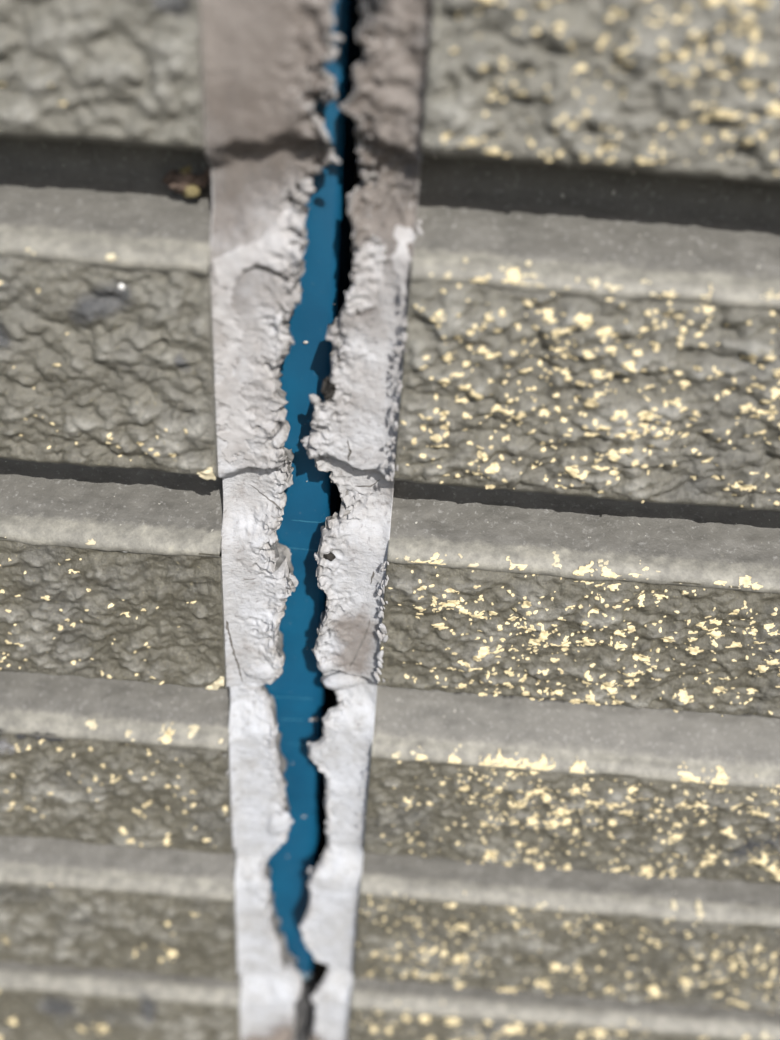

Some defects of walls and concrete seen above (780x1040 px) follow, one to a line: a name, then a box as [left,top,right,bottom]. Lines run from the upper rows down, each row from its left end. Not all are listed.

crack [226,0,379,839]
crack [307,828,326,884]
crack [264,858,329,1040]